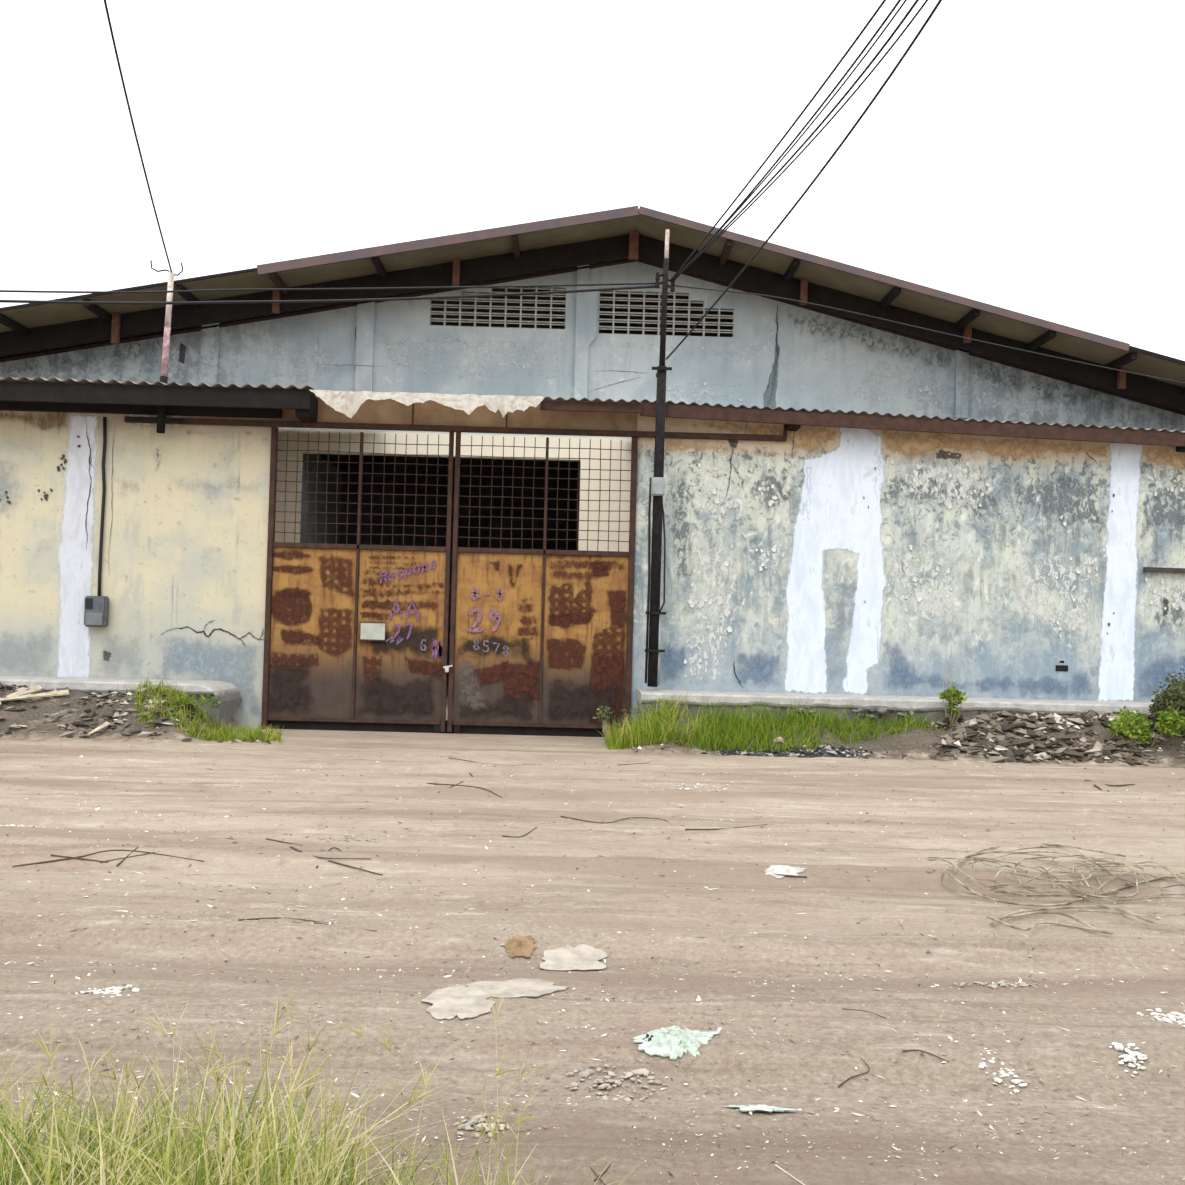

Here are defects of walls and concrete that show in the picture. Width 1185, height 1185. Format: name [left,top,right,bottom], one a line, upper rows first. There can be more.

crack [724,305,780,504]
crack [161,620,264,647]
rust [270,550,443,716]
rust [460,555,627,723]
water stain [877,622,965,688]
water stain [981,675,1088,693]
water stain [1144,658,1185,695]
water stain [1155,591,1184,627]